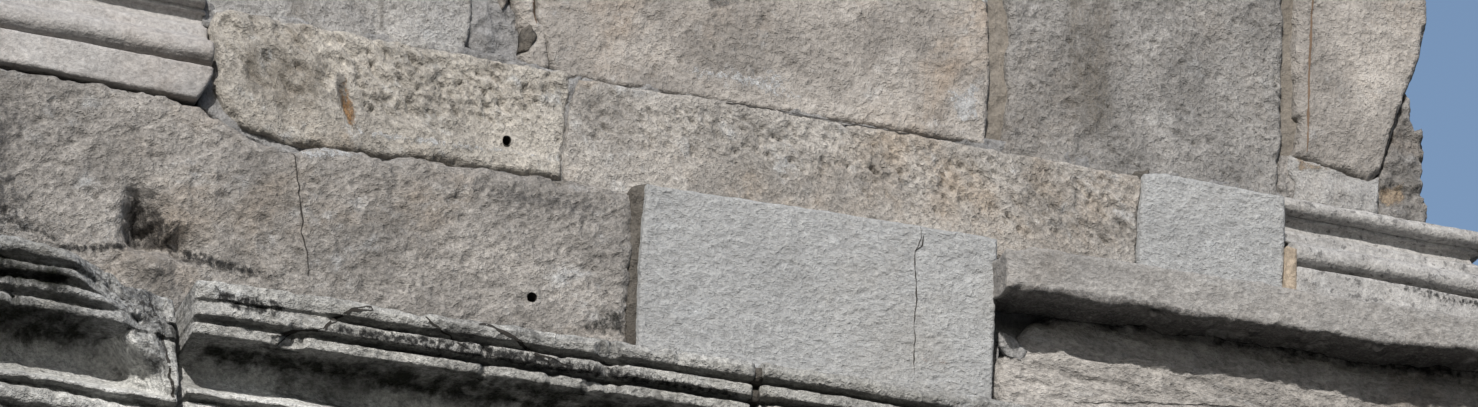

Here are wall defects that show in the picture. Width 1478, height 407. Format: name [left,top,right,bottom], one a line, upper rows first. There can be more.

crack [293,154,309,276]
leakage [0,255,68,290]
leakage [53,199,284,316]
leakage [0,300,106,346]
crack [270,305,373,347]
crack [425,316,567,366]
crack [913,227,924,371]